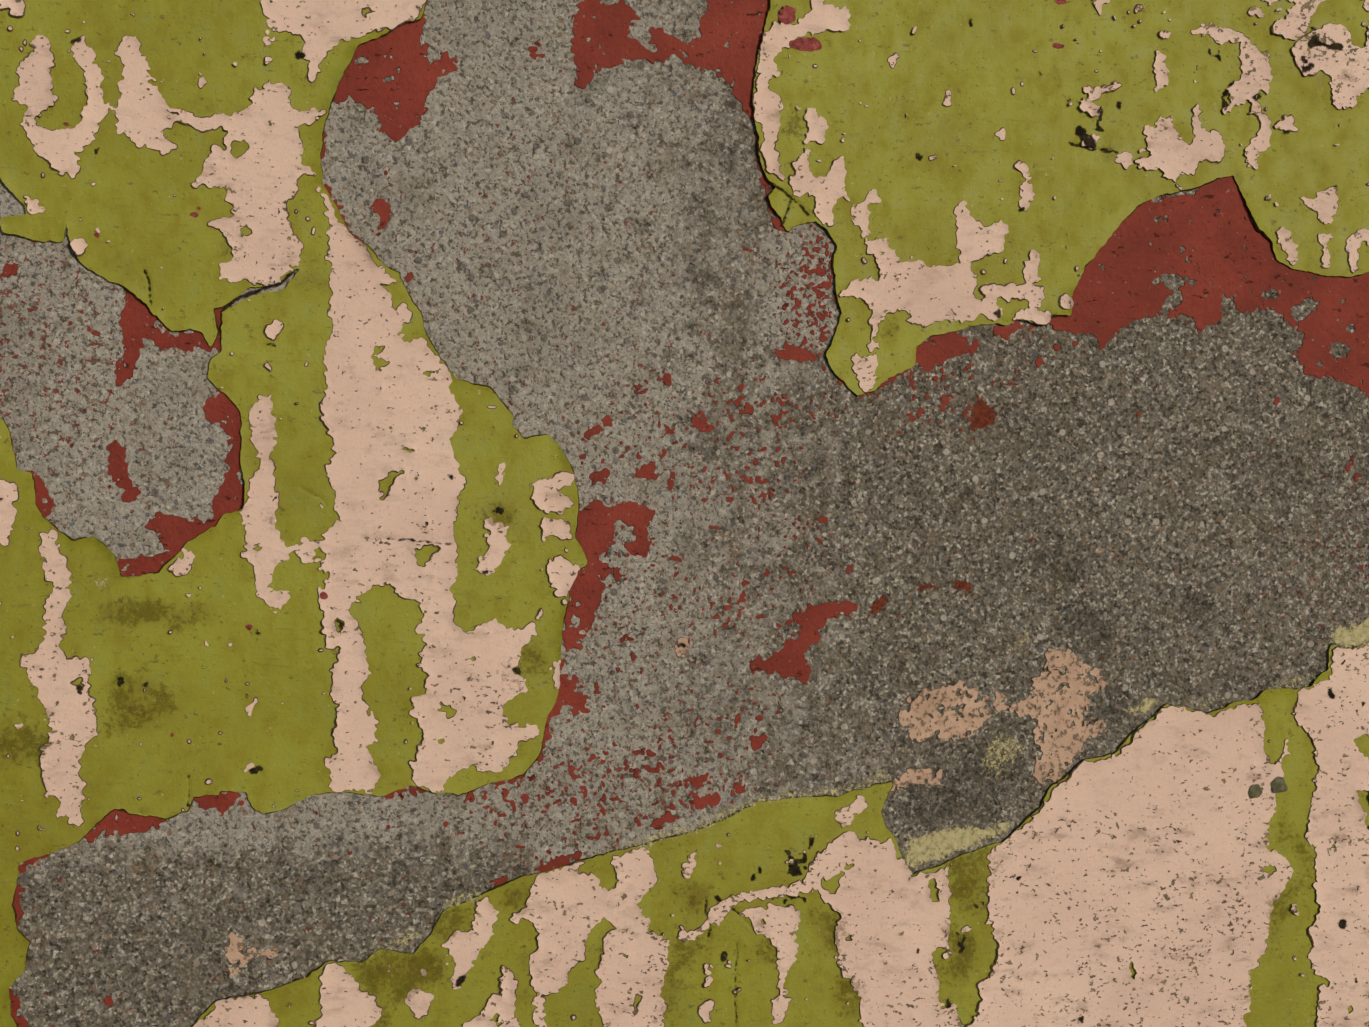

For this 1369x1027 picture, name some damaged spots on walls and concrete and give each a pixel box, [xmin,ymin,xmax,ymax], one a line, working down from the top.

peeling [0,0,392,576]
peeling [367,245,440,356]
peeling [825,296,1029,396]
peeling [752,0,1369,353]
peeling [0,418,340,1027]
peeling [343,583,429,796]
peeling [435,372,588,796]
peeling [314,873,539,1027]
peeling [543,918,616,1027]
peeling [571,781,903,1027]
peeling [918,840,1004,1027]
peeling [1207,688,1329,1027]